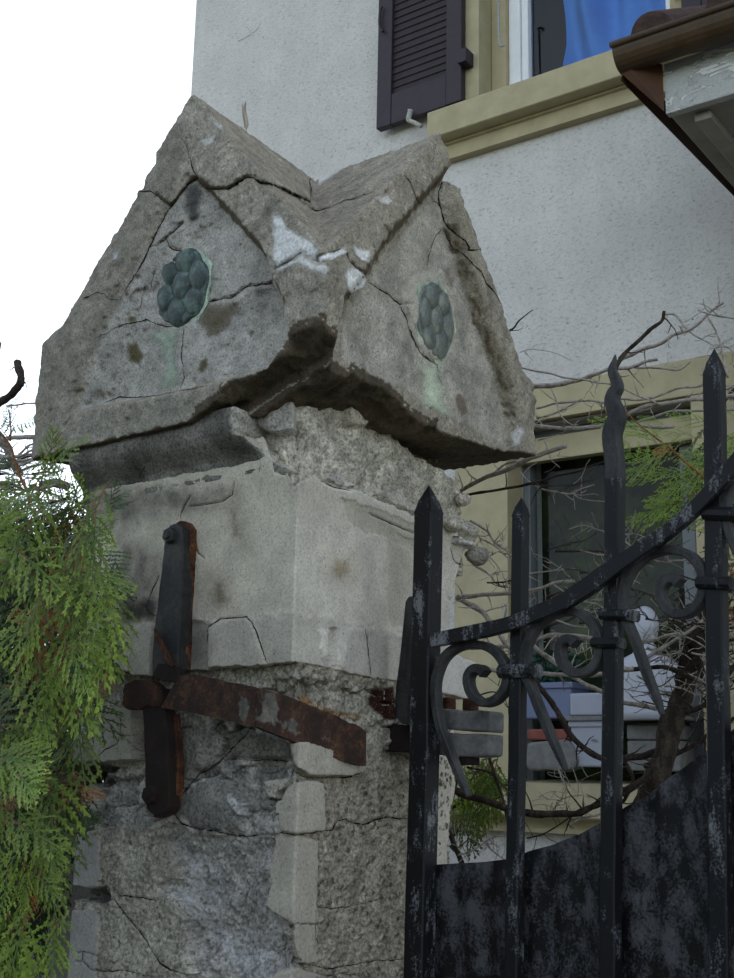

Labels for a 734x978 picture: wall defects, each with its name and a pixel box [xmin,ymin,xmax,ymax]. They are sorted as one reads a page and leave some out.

crack [84,140,369,402]
crack [209,248,442,384]
crack [405,176,502,304]
spalling [193,313,476,577]
corrosion [152,714,185,818]
crack [183,728,361,793]
spalling [263,675,410,765]
crack [174,814,408,859]
crack [78,895,197,978]
crack [312,958,404,978]